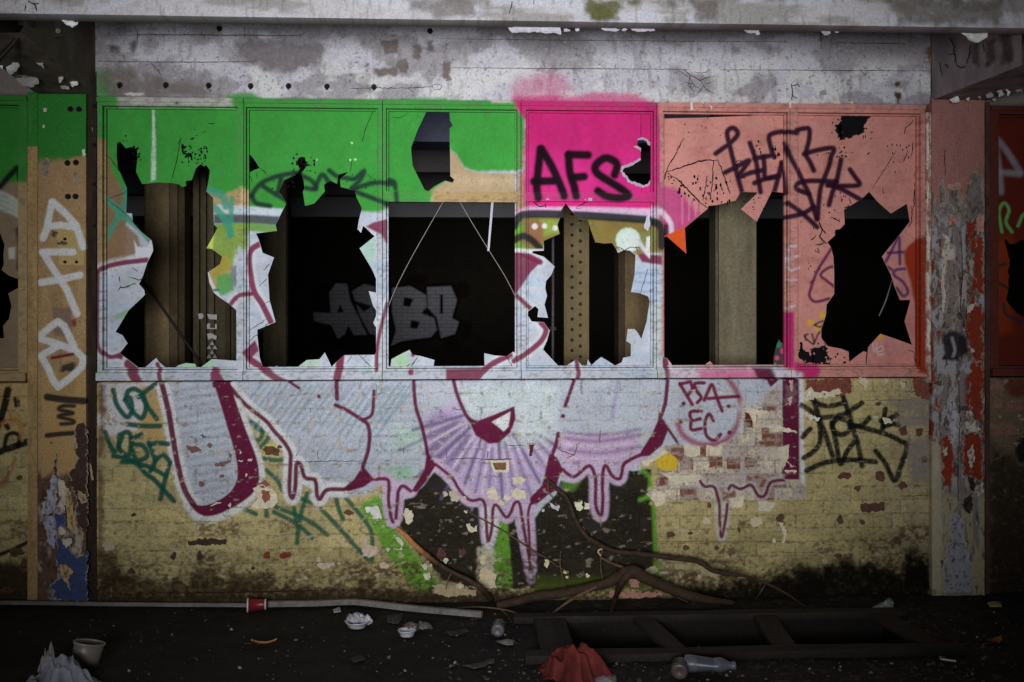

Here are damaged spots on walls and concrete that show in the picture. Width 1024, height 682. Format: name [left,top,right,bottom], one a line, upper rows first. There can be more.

crack [350,40,747,179]
spalling [884,377,929,400]
peeling [926,122,1024,593]
peeling [41,421,94,601]
water stain [98,527,517,603]
spalling [641,377,868,543]
water stain [689,549,929,598]
spalling [838,472,885,525]